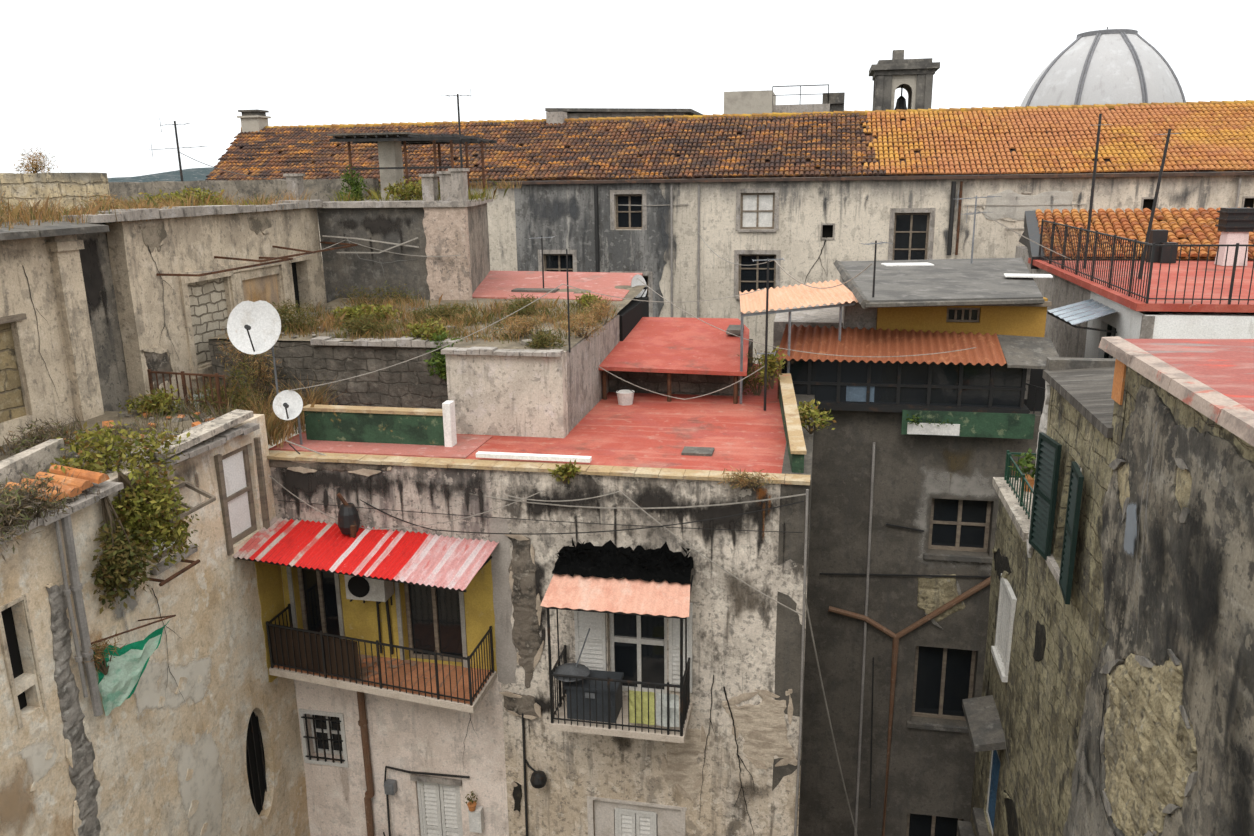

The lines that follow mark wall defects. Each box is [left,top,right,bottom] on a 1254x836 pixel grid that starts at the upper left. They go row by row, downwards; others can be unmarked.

water stain [280,468,484,526]
water stain [526,485,781,575]
spalling [992,548,1011,580]
spalling [499,532,544,720]
spalling [1033,620,1046,662]
water stain [1177,495,1222,738]
spalling [1100,649,1198,836]
spalling [1000,790,1019,836]